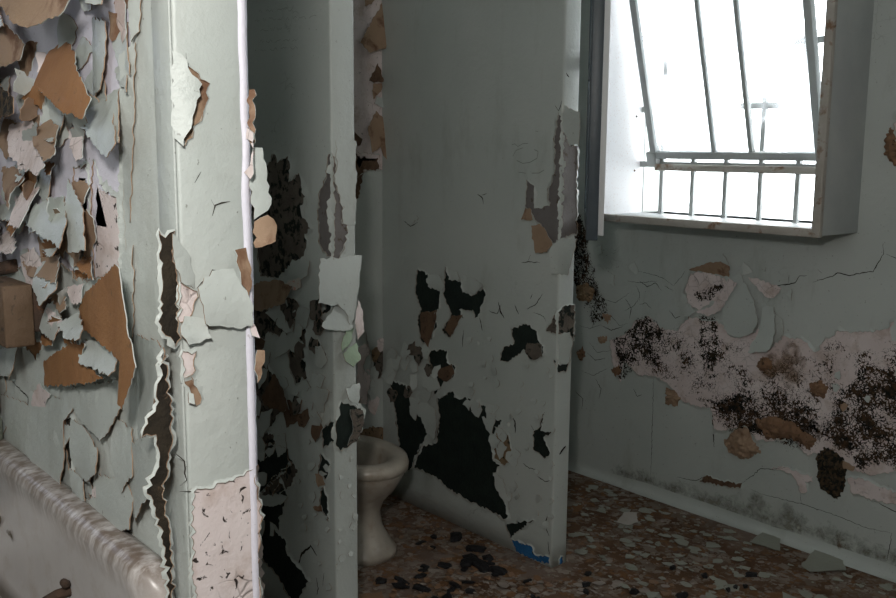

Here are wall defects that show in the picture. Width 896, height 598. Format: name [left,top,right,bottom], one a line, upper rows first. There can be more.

peeling [0,0,387,598]